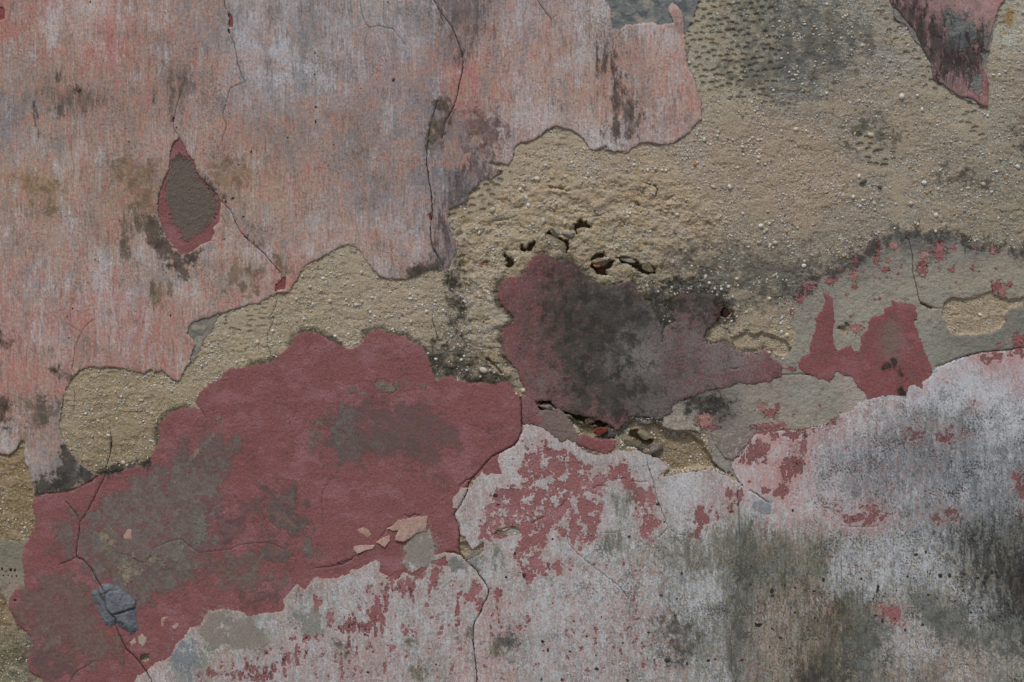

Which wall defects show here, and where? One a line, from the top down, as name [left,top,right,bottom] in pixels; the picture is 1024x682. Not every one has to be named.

peeling [157,137,221,255]
crack [222,206,278,270]
crack [426,0,464,288]
peeling [797,293,932,400]
crack [64,431,112,593]
peeling [206,636,308,682]
peeling [387,516,428,542]
peeling [403,527,470,597]
crack [451,397,523,682]
leakage [457,624,523,662]
leakage [641,598,744,681]
leakage [916,520,1024,665]